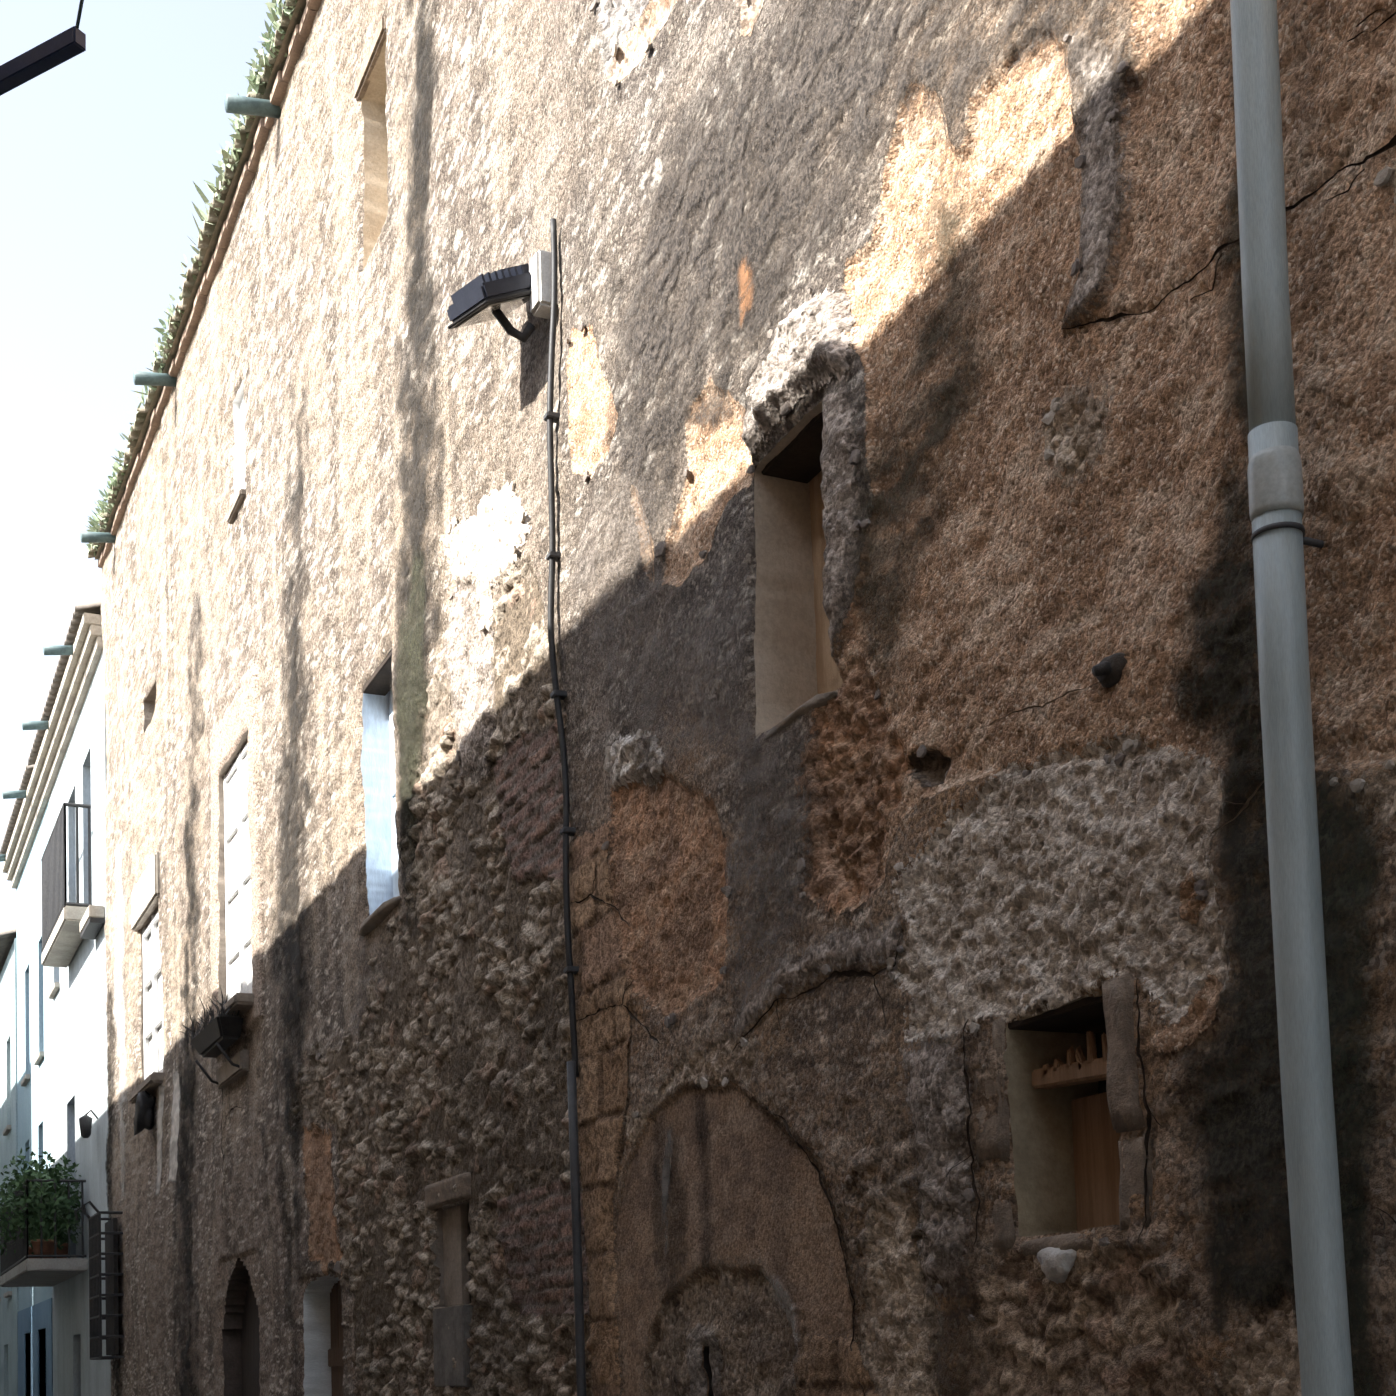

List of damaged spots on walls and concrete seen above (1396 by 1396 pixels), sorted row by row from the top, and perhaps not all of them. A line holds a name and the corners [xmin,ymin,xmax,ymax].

peeling [589,0,678,87]
peeling [630,377,755,587]
damp [637,176,779,579]
damp [855,196,980,658]
peeling [794,0,1253,1055]
crack [1062,238,1240,329]
peeling [1277,0,1396,838]
crack [1285,135,1396,211]
damp [156,598,204,1396]
damp [262,388,312,1328]
crack [732,934,901,1052]
crack [1136,978,1163,1243]